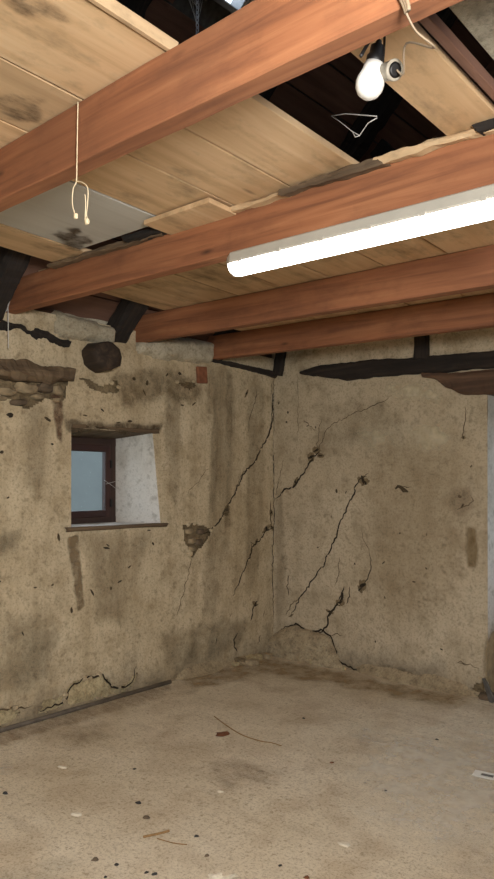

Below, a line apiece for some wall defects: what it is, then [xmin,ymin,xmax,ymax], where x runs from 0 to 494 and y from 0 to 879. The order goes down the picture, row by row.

damp [69,420,160,434]
spalling [183,522,212,557]
crack [204,380,392,670]
damp [68,536,83,610]
crack [0,667,136,712]